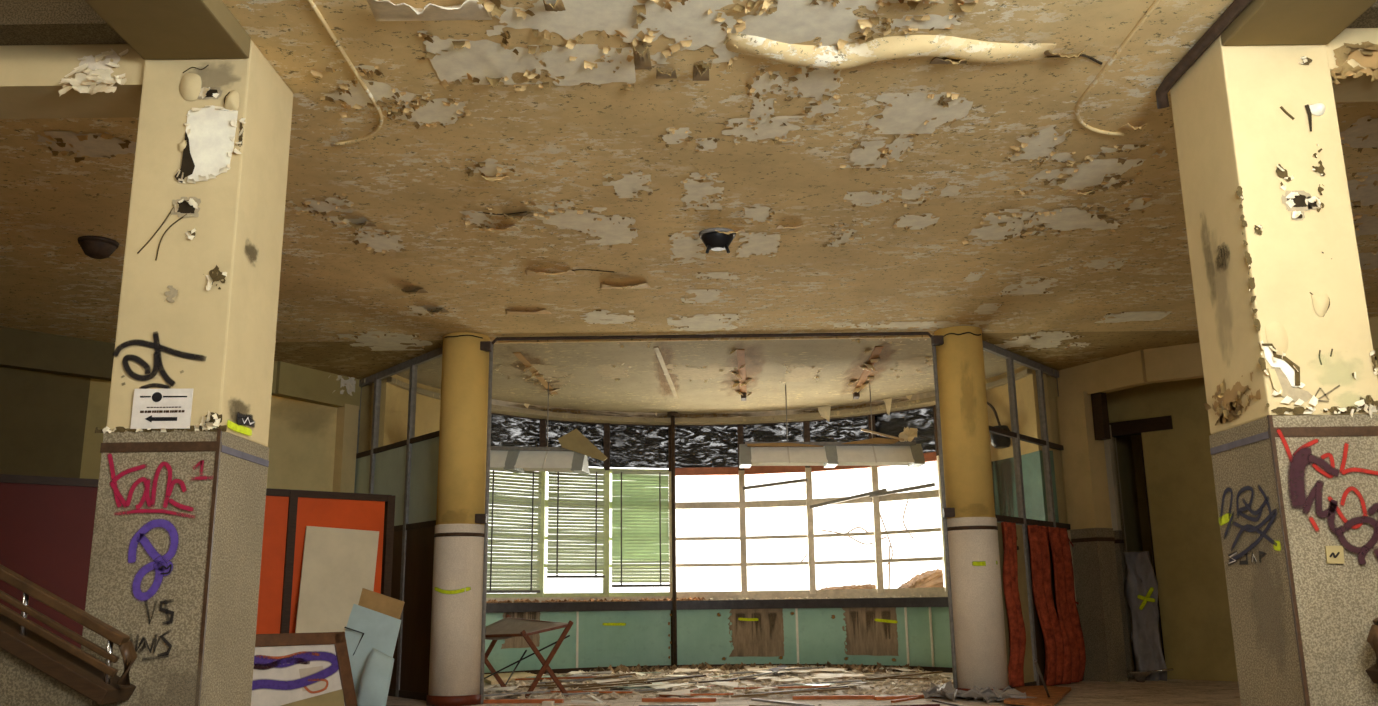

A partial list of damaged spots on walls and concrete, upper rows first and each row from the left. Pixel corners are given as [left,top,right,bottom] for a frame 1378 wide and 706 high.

peeling [58,49,128,97]
peeling [171,87,246,240]
peeling [203,265,227,291]
peeling [459,171,653,248]
peeling [311,0,978,129]
peeling [667,203,803,332]
peeling [658,66,844,153]
peeling [840,92,973,172]
peeling [961,123,1168,245]
peeling [1204,172,1378,425]
spalling [1276,103,1326,221]
peeling [1330,41,1378,84]